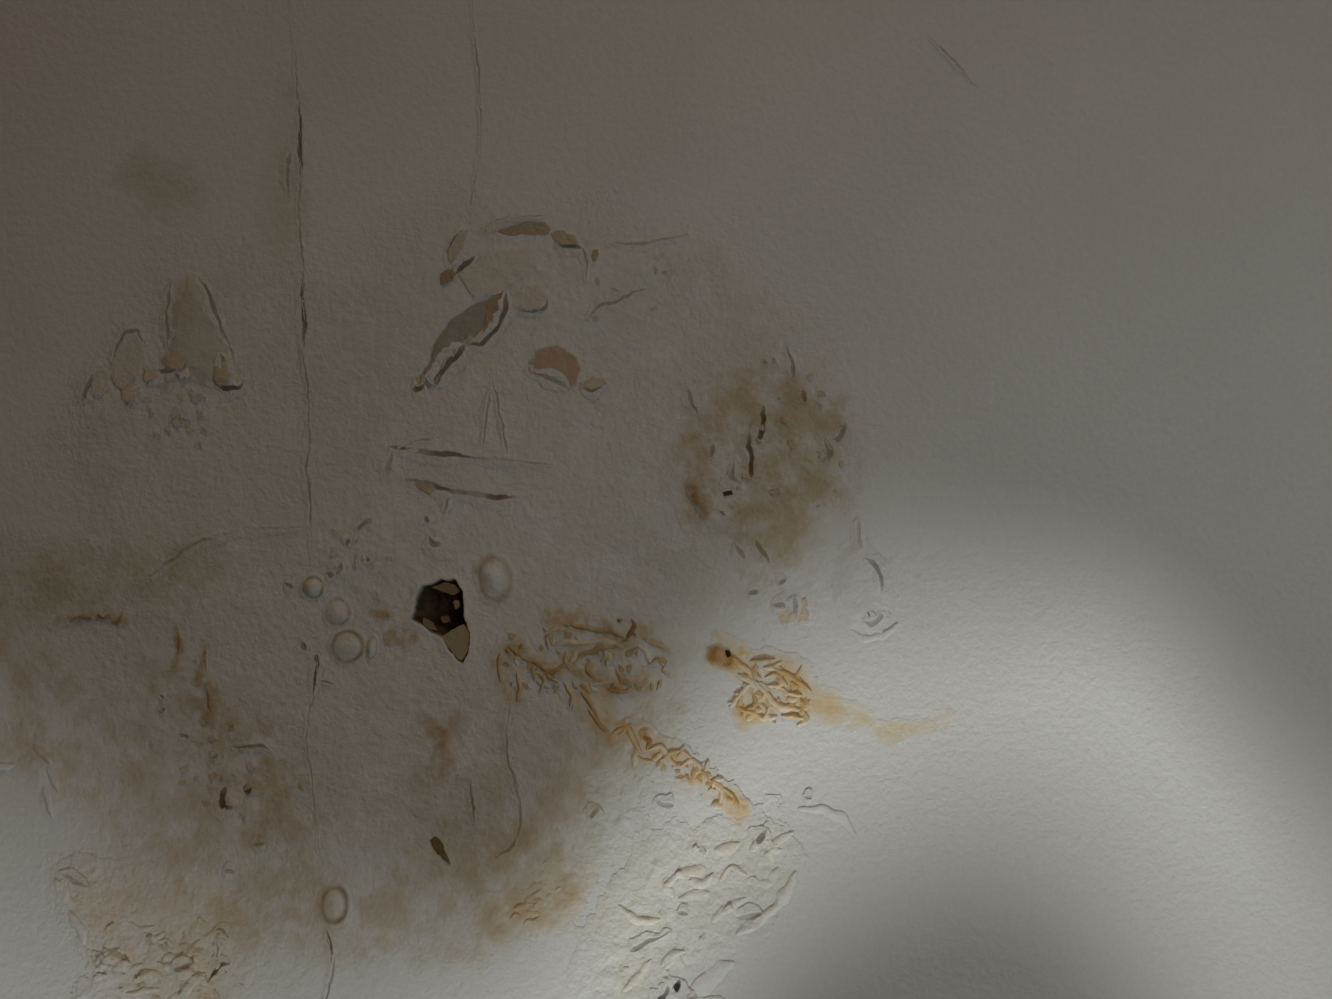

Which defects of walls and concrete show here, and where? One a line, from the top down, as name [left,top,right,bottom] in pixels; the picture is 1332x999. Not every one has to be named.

spalling [411,290,518,403]
spalling [525,344,608,401]
leakage [0,139,891,999]
peeling [442,624,470,660]
rust [486,603,754,818]
rust [698,631,956,747]
peeling [49,852,245,999]
crack [321,928,339,999]
peeling [567,789,857,999]